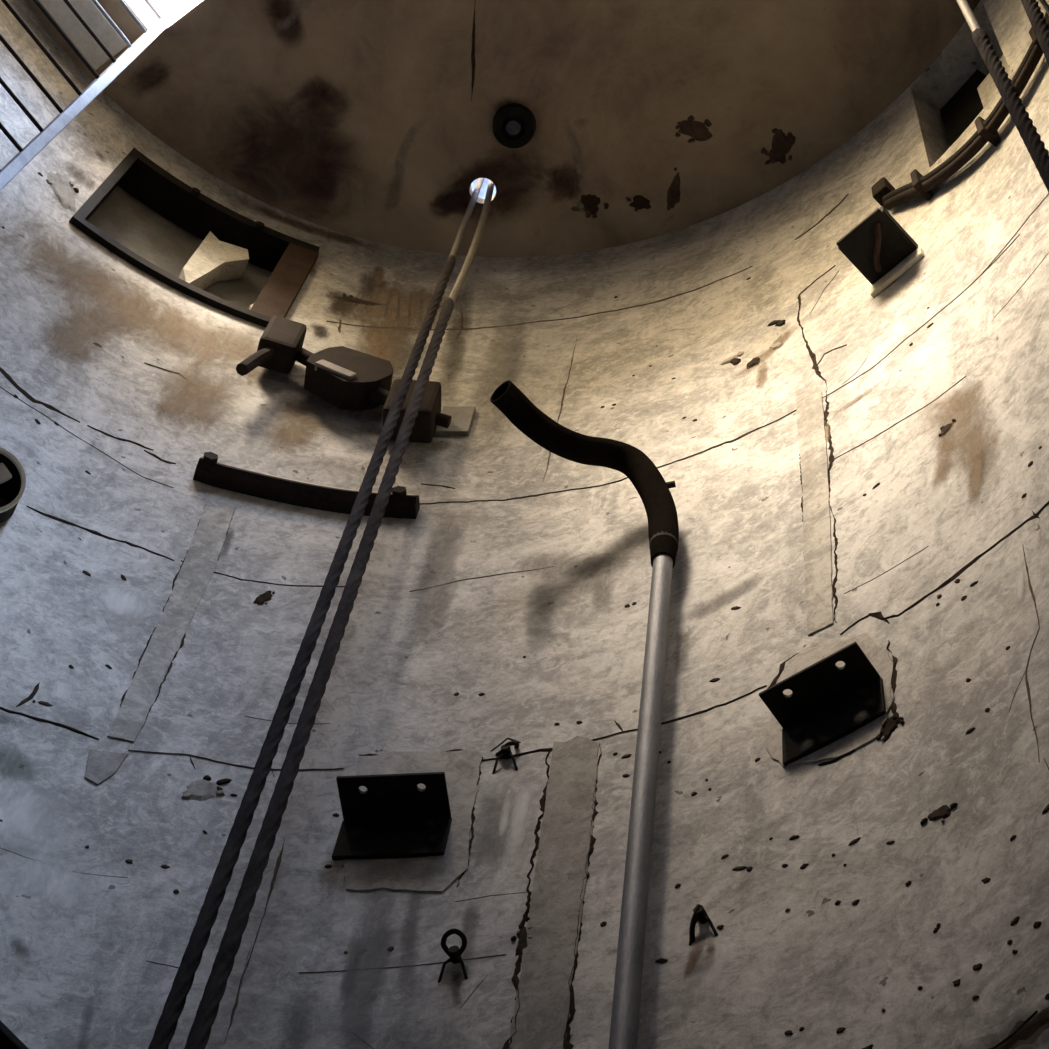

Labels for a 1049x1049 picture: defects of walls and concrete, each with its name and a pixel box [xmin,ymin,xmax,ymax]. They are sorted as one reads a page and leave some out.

water stain [223,81,361,245]
spalling [675,115,713,143]
spalling [761,128,796,165]
crack [327,266,752,423]
crack [795,193,1049,398]
crack [0,367,176,488]
crack [420,451,628,504]
crack [657,410,796,469]
crack [834,376,966,459]
crack [840,501,1049,770]
spalling [85,626,186,785]
crack [992,1007,1049,1049]